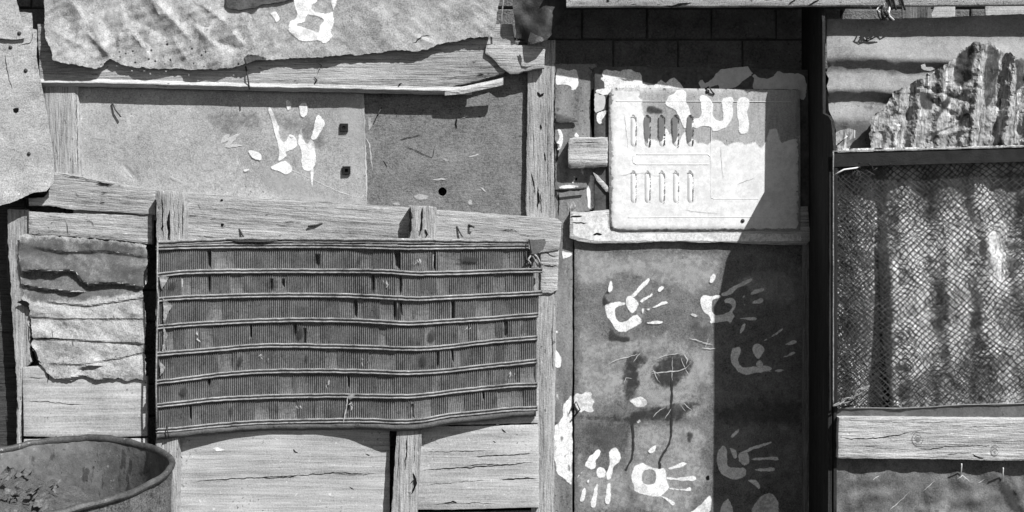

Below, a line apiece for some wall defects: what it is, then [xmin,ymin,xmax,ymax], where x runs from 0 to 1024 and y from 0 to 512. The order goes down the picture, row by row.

peeling [556,66,807,242]
crack [203,472,382,481]